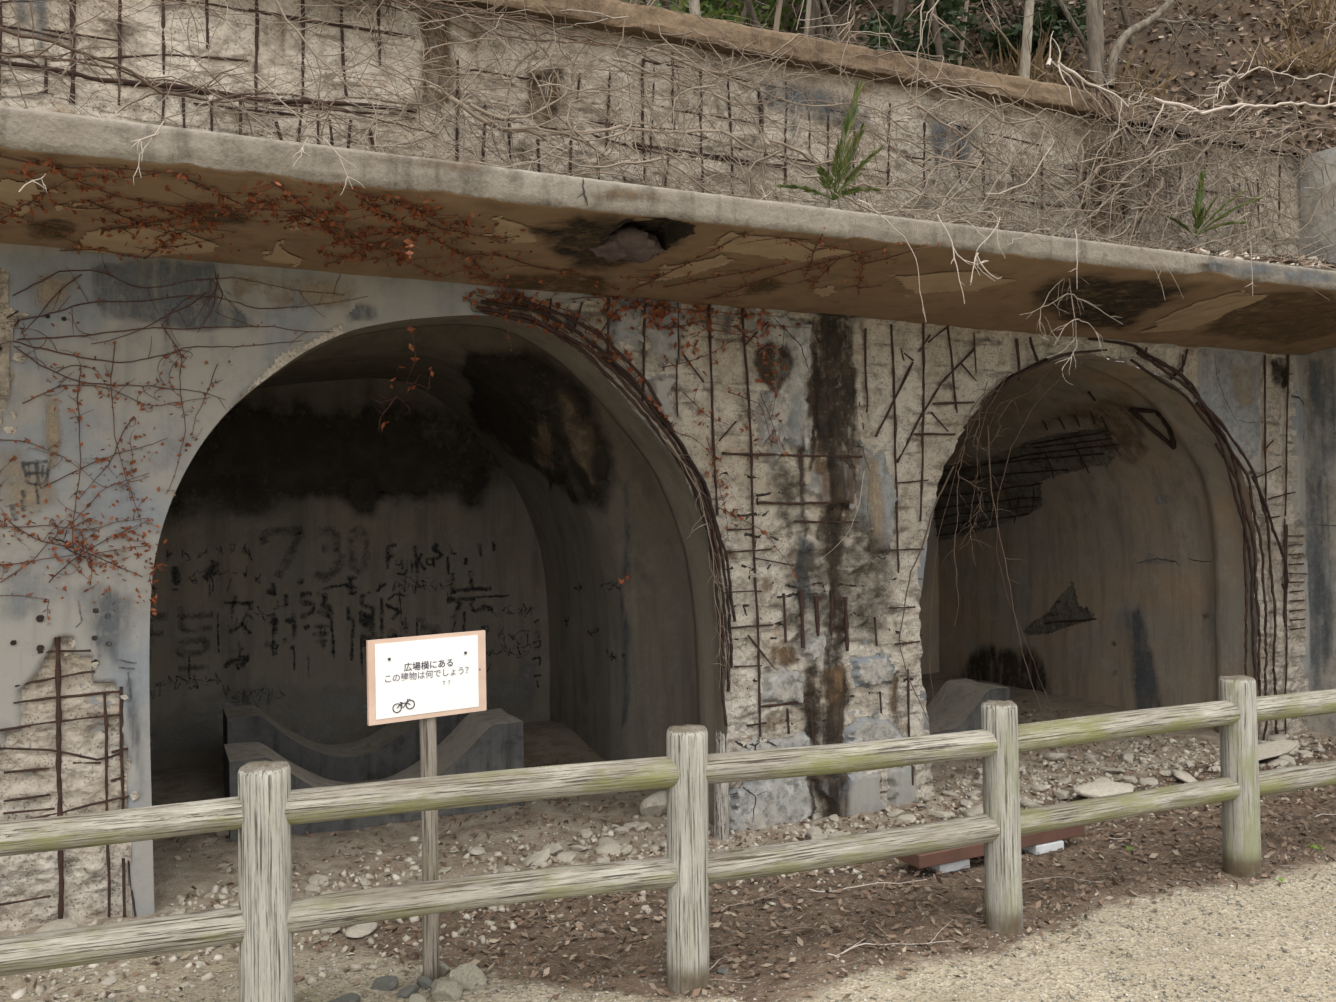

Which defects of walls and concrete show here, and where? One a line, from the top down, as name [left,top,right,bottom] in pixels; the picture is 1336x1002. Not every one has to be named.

peeling [0,179,85,222]
spalling [0,0,418,152]
spalling [455,17,1281,245]
spalling [0,269,29,434]
water stain [773,313,884,746]
spalling [468,216,1309,752]
spalling [0,636,140,821]
water stain [808,773,849,820]
flaking render [729,763,983,847]
spalling [1258,716,1326,769]
spalling [0,842,137,933]